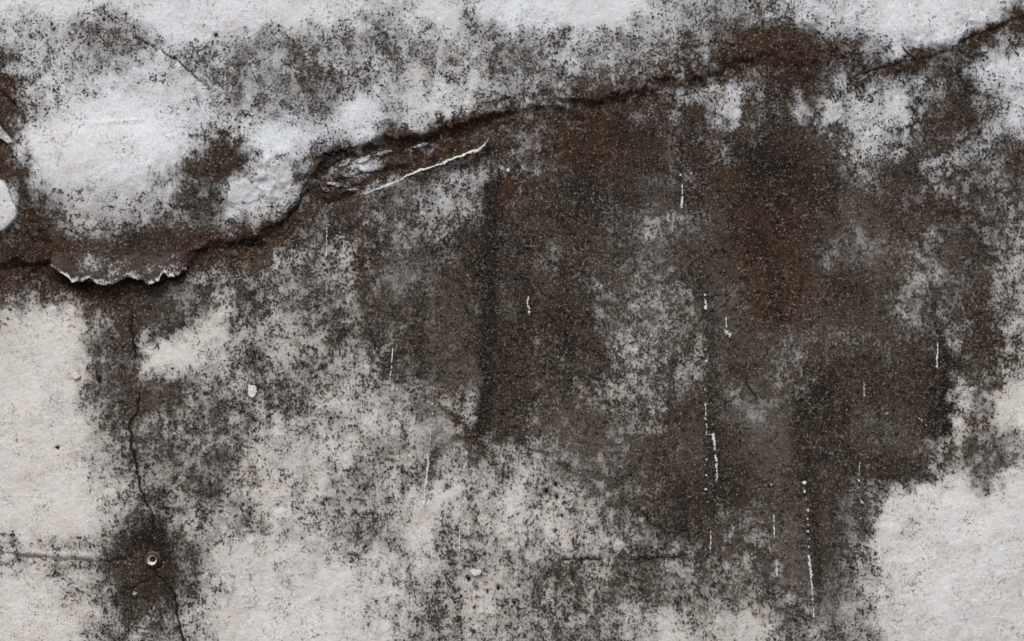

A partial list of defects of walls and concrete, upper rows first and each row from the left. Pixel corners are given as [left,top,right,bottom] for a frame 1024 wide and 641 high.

water stain [0,2,164,129]
crack [136,35,256,82]
crack [856,18,1023,77]
flaking render [286,102,510,195]
crack [12,230,55,242]
flaking render [48,249,187,289]
crack [184,146,414,263]
crack [128,312,155,531]
crack [110,574,184,641]